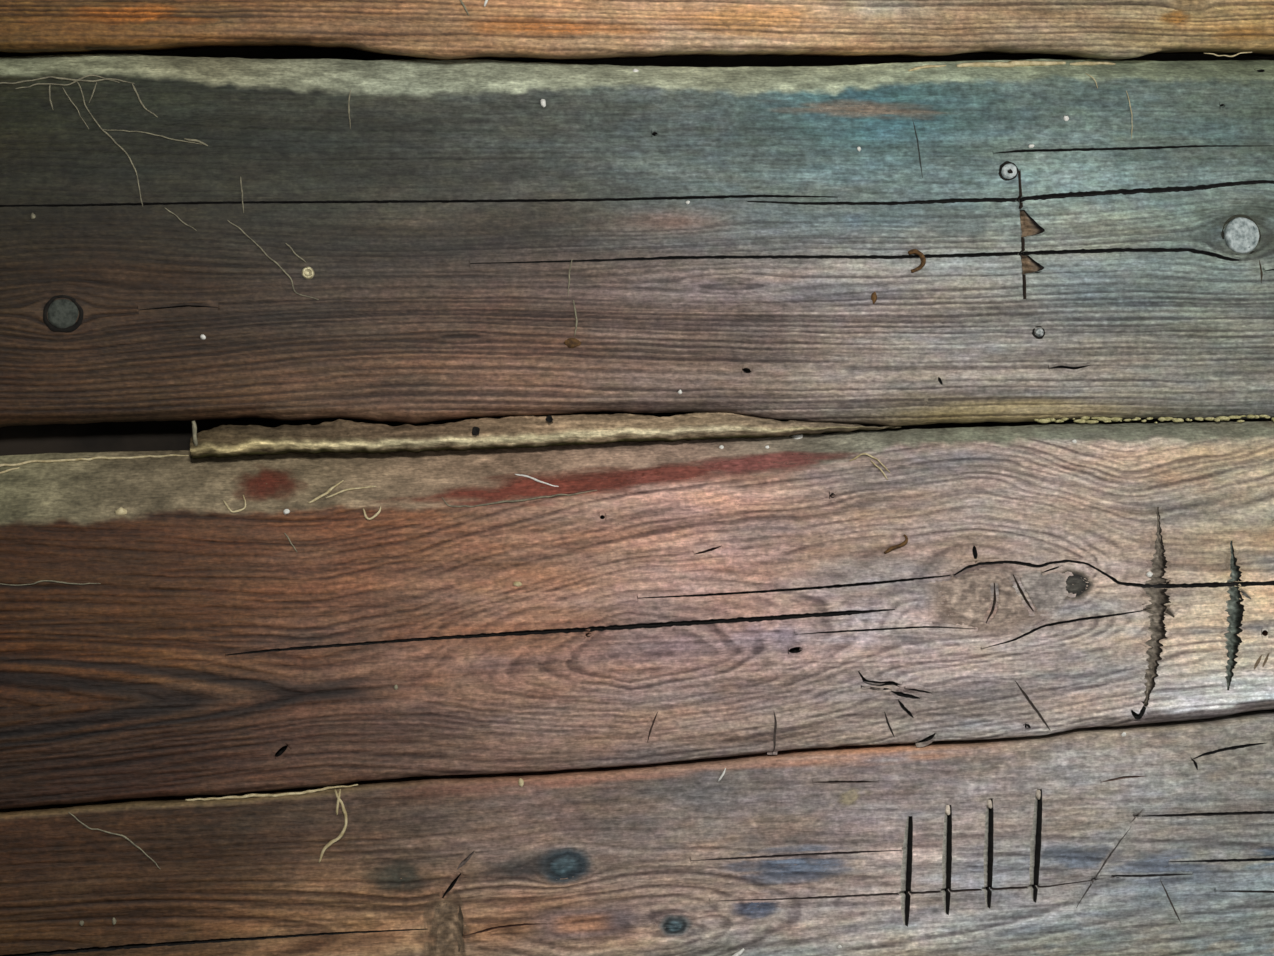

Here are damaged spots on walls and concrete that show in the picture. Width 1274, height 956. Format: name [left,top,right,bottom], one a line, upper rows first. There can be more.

damp [811,104,919,115]
crack [0,141,1274,212]
crack [470,243,1274,276]
damp [567,452,832,487]
crack [225,555,1274,661]
crack [691,845,902,866]
crack [710,853,1274,906]